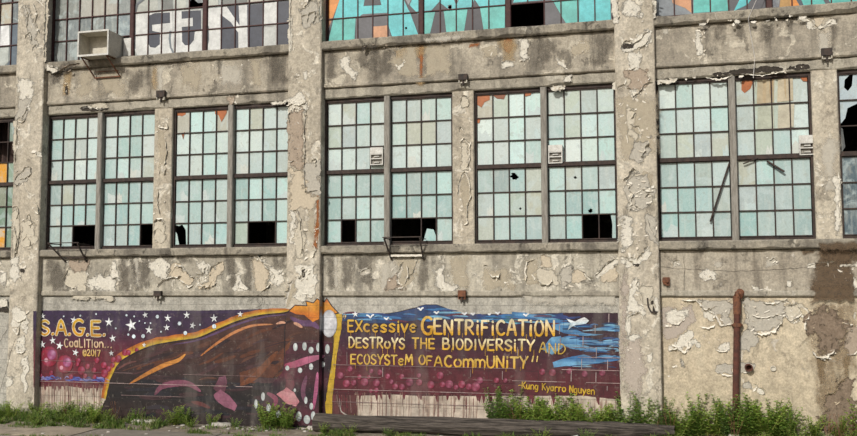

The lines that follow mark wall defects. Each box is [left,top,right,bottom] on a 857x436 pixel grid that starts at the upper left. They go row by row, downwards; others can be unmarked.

peeling [287,0,323,52]
peeling [12,78,36,187]
peeling [232,70,321,306]
peeling [482,0,857,399]
peeling [0,202,39,287]
peeling [63,258,121,302]
peeling [146,256,224,290]
peeling [360,258,419,291]
peeling [432,264,459,291]
damp [801,241,857,303]
peeling [0,298,30,393]